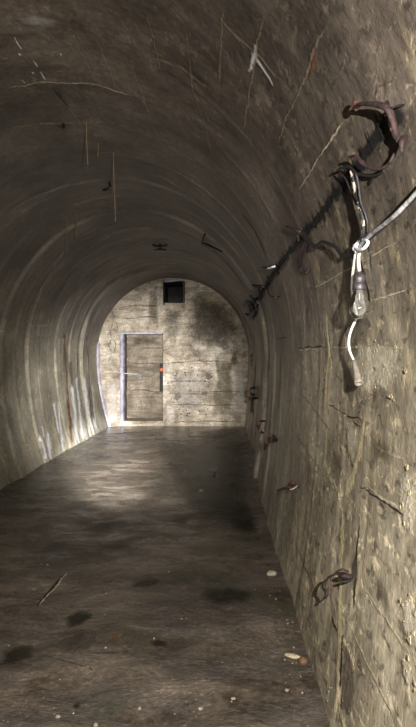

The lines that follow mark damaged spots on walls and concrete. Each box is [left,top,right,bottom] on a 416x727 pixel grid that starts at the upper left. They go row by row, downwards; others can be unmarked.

water stain [190,300,236,347]
rust [63,335,73,442]
water stain [214,353,243,410]
crack [278,333,360,426]
crack [360,486,404,516]
crack [352,525,360,606]